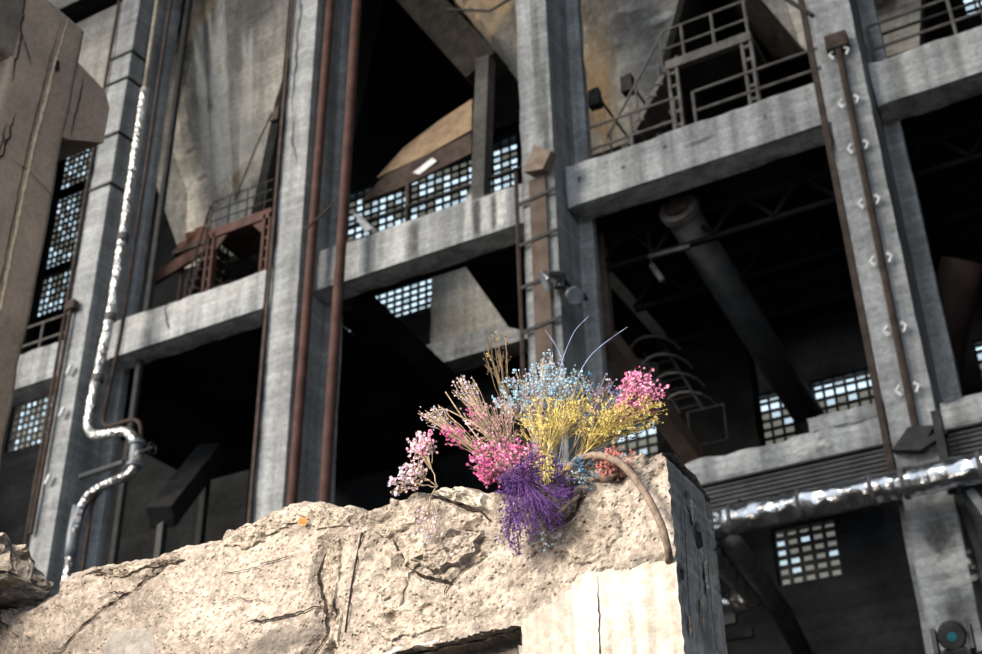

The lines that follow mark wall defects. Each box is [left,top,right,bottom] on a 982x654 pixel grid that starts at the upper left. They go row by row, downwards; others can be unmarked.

crack [71,75,84,134]
crack [0,0,68,310]
crack [59,564,167,654]
crack [213,552,338,654]
crack [392,537,486,595]
crack [410,629,523,654]